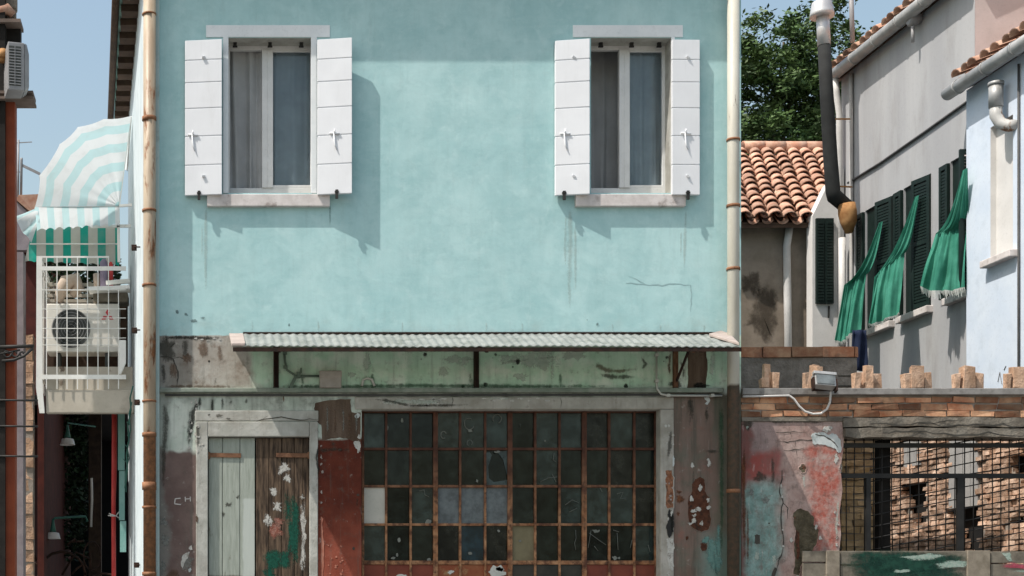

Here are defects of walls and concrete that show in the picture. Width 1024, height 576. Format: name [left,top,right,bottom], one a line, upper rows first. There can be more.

crack [626,276,692,312]
water stain [741,274,777,340]
water stain [159,338,232,420]
peeling [313,398,362,473]
peeling [811,426,842,473]
flaking render [664,424,722,576]
flaking render [789,507,822,576]